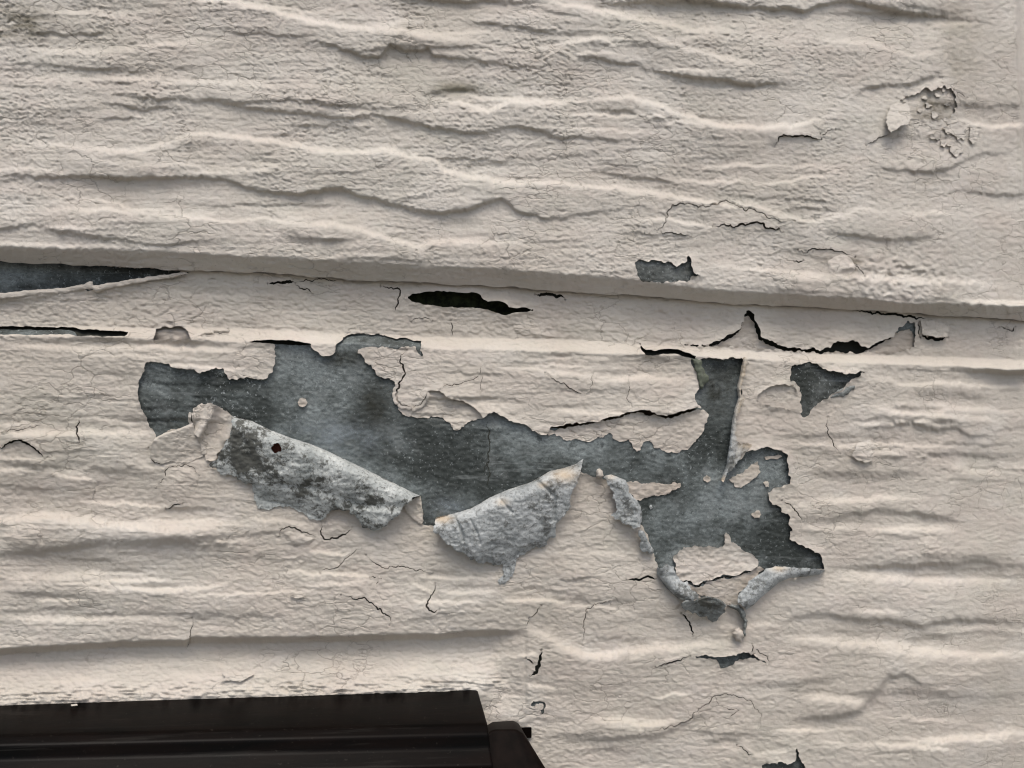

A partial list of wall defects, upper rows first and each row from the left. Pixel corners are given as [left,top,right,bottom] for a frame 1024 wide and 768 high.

spalling [865,85,981,157]
crack [644,197,866,277]
peeling [0,261,188,299]
peeling [635,256,698,283]
peeling [138,310,950,669]
crack [525,650,545,678]
crack [656,612,696,670]